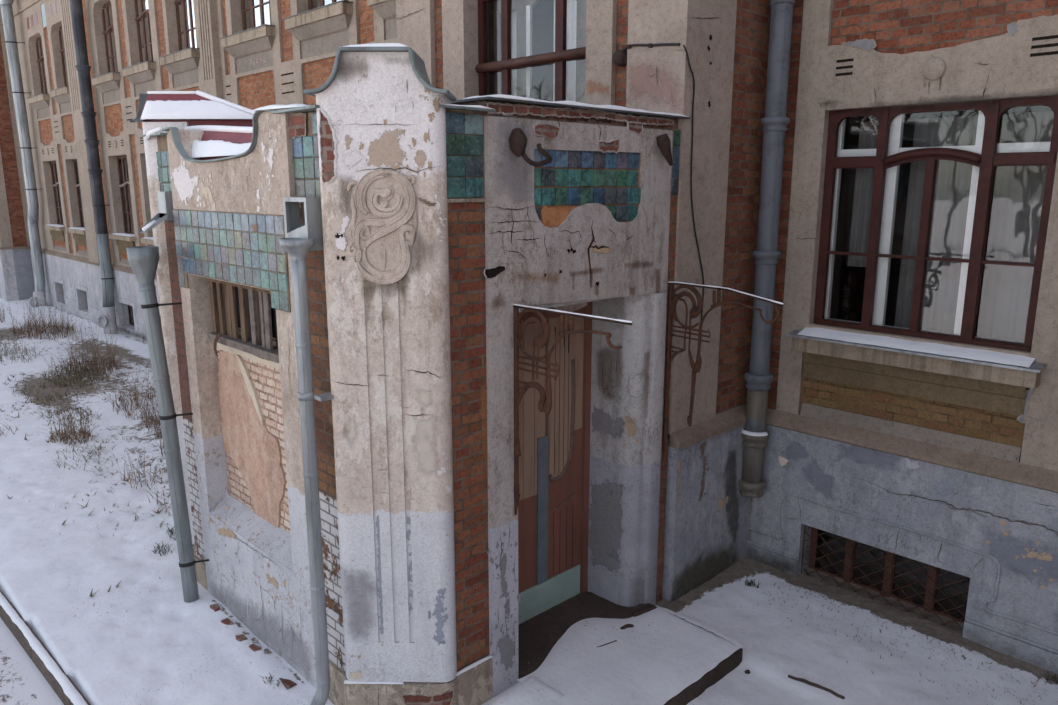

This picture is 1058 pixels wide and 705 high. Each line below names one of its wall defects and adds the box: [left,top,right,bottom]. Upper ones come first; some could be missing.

flaking render [288,81,443,186]
peeling [170,160,221,209]
crack [488,205,648,287]
water stain [598,349,621,398]
peeling [216,343,286,528]
crack [853,477,1058,535]
peeling [428,588,448,645]
flaking render [398,683,456,705]